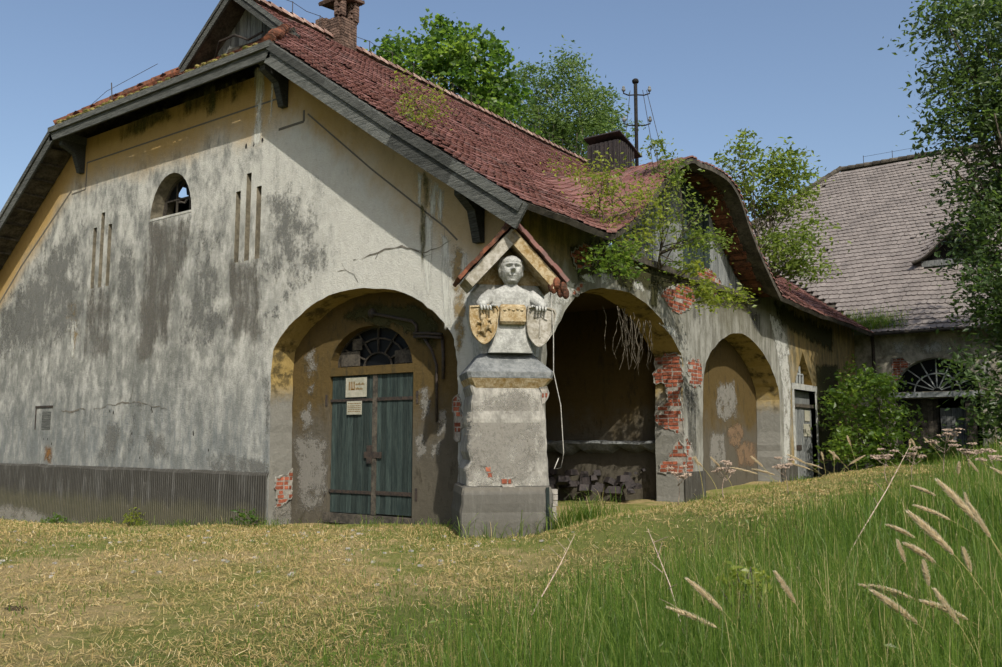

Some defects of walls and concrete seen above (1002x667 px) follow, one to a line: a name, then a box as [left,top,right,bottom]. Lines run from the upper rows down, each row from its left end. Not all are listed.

damp [0,196,326,365]
crack [337,232,451,282]
damp [418,173,467,327]
peeling [544,242,610,325]
flaking render [661,284,696,315]
flaking render [697,268,722,296]
peeling [273,349,328,525]
flaking render [652,353,703,475]
peeling [709,379,757,469]